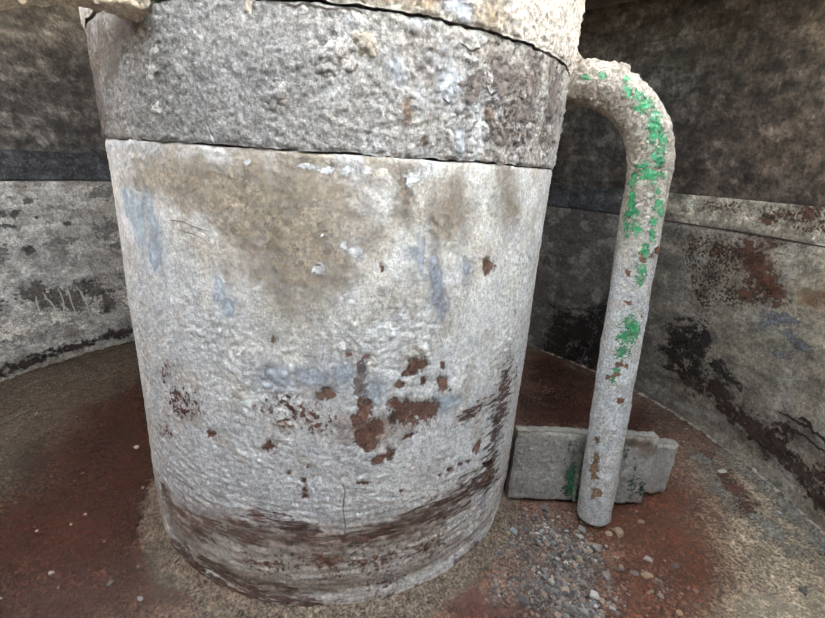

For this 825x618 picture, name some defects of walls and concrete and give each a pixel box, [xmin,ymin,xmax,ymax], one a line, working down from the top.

crack [281,2,364,18]
corrosion [161,359,207,427]
corrosion [0,381,501,607]